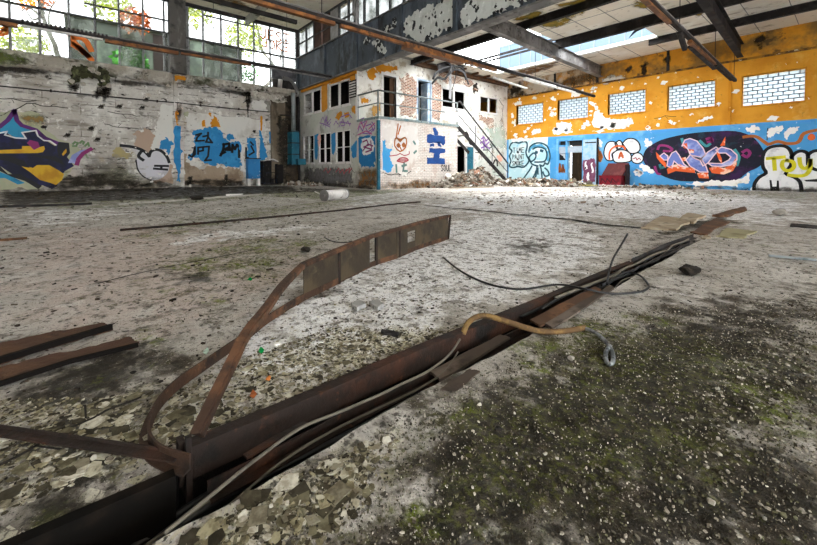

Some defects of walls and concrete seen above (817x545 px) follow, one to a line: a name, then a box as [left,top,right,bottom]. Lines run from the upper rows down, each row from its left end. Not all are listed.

peeling [351,0,528,176]
peeling [511,87,634,147]
peeling [644,118,676,147]
peeling [745,115,799,140]